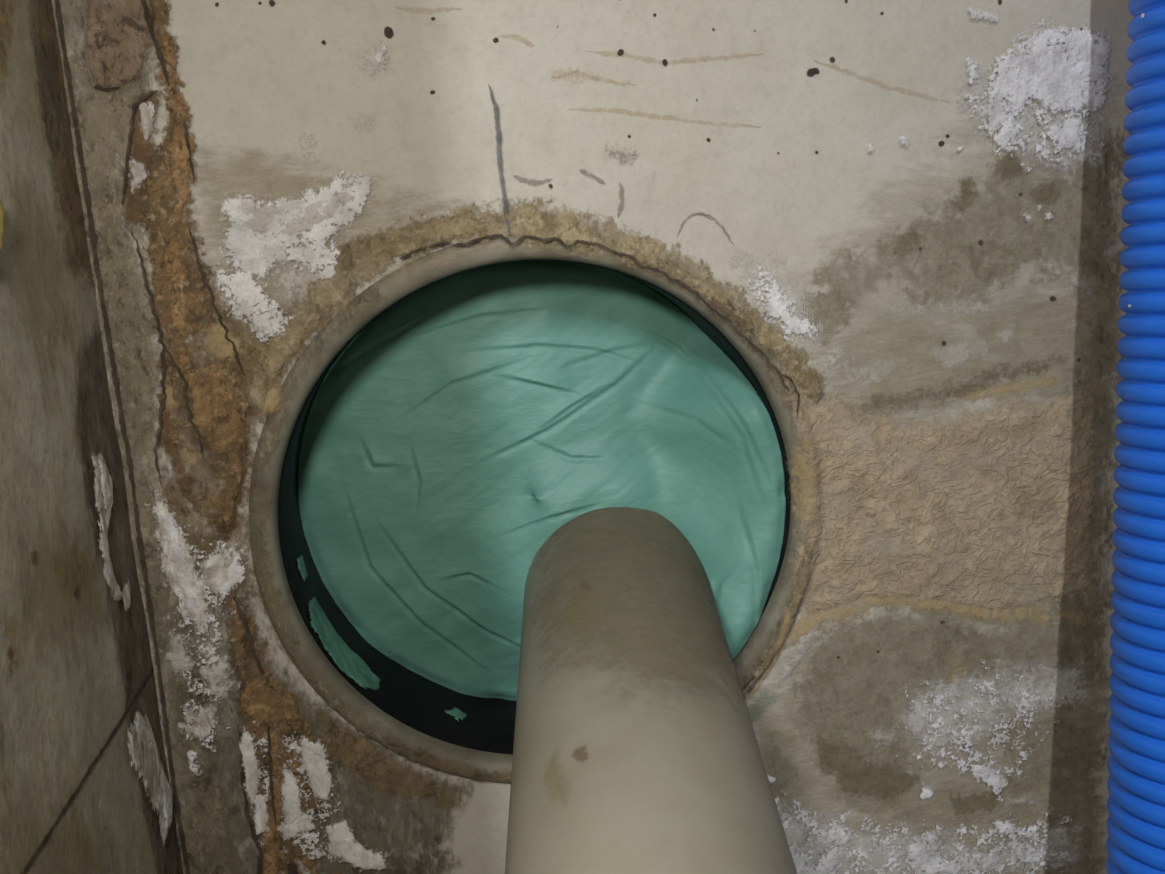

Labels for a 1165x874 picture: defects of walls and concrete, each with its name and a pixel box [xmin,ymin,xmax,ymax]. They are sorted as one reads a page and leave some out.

rust [124,0,459,874]
crack [400,85,800,416]
water stain [215,18,1128,874]